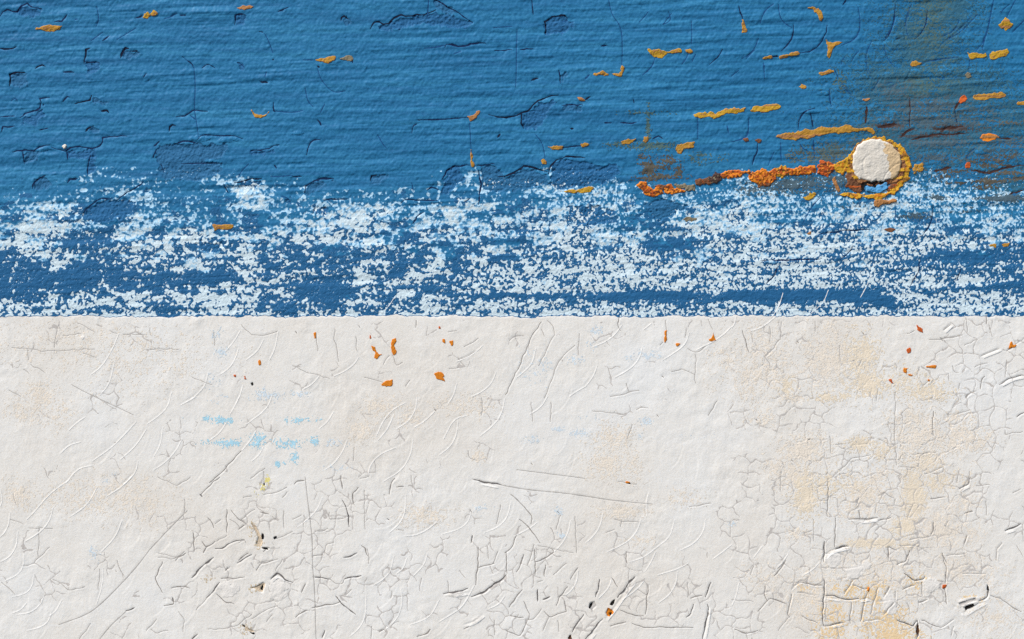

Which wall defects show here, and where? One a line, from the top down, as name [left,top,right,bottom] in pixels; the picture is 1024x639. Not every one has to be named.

crack [0,2,185,188]
crack [83,13,347,214]
crack [341,0,591,224]
peeling [648,48,693,58]
peeling [694,104,781,119]
crack [602,0,1024,195]
rust [602,0,1024,222]
peeling [776,125,875,141]
peeling [967,49,1009,60]
peeling [959,92,1024,105]
peeling [370,335,397,359]
crack [0,317,1024,639]